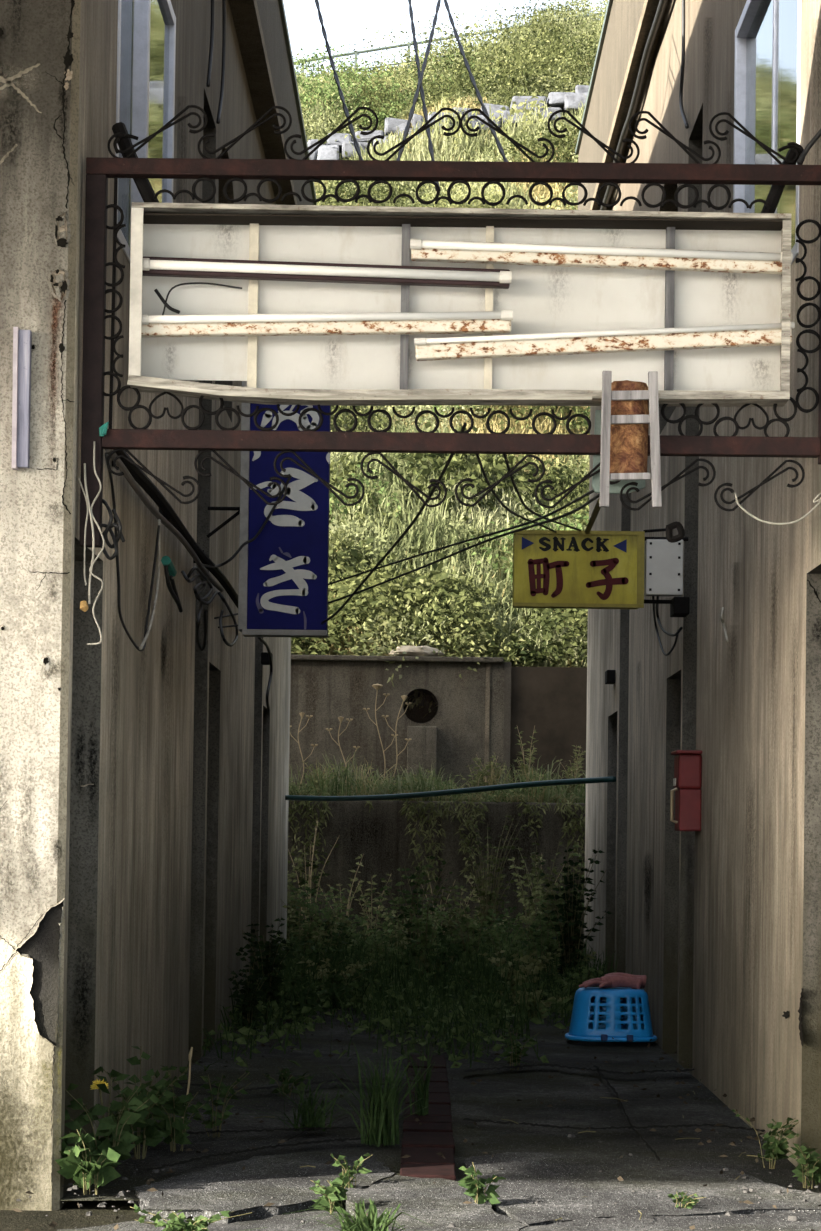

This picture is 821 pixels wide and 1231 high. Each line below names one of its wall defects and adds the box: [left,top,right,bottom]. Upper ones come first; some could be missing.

crack [0,914,43,971]
peeling [15,899,65,1047]
leakage [0,1087,32,1210]